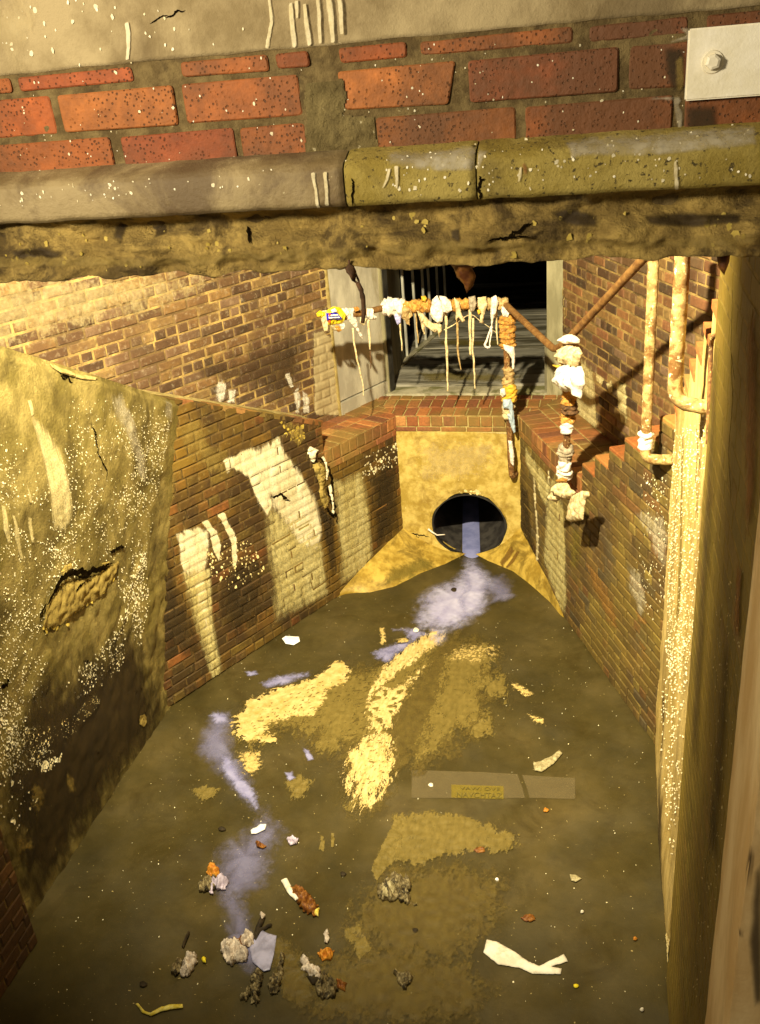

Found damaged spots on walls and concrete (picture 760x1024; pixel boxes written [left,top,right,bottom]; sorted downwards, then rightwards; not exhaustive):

water stain [265,0,273,49]
water stain [289,0,343,48]
crack [489,222,533,241]
water stain [28,400,71,529]
crack [91,425,108,480]
water stain [2,506,34,559]
water stain [223,439,396,613]
spalling [0,401,171,831]
water stain [164,513,261,678]